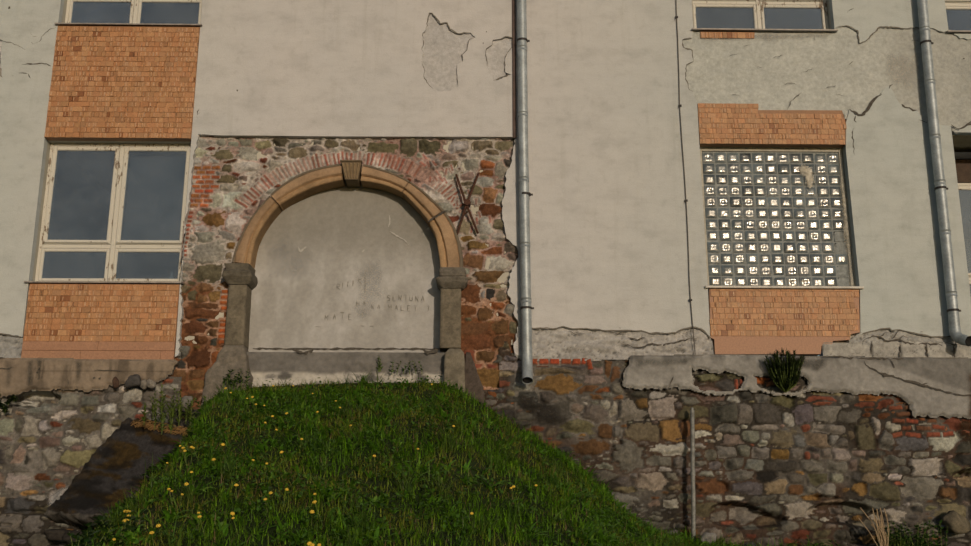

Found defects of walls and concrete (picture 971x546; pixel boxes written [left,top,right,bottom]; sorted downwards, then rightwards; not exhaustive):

crack [0,27,56,79]
spalling [421,13,475,92]
spalling [485,31,512,81]
spalling [682,25,971,132]
flaking render [174,136,714,429]
spalling [0,333,23,358]
spalling [849,327,955,347]